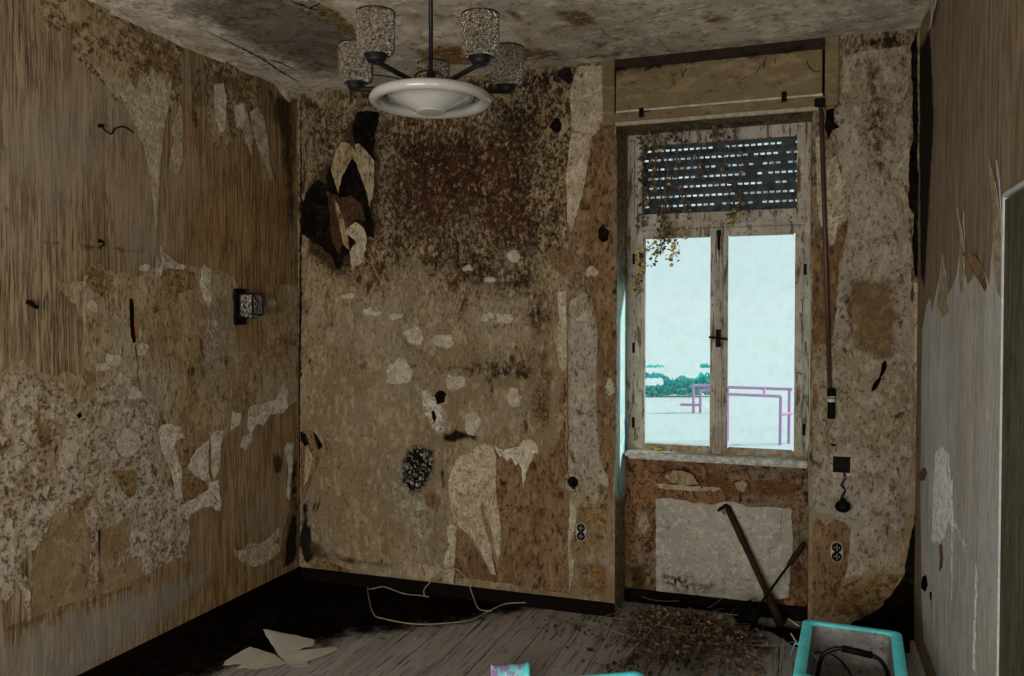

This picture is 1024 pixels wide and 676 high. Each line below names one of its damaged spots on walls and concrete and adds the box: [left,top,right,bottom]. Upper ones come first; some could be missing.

water stain [416,46,471,65]
peeling [214,83,246,132]
spalling [301,111,380,270]
water stain [309,49,576,296]
flaking render [443,126,618,594]
water stain [421,390,446,433]
water stain [386,446,441,542]